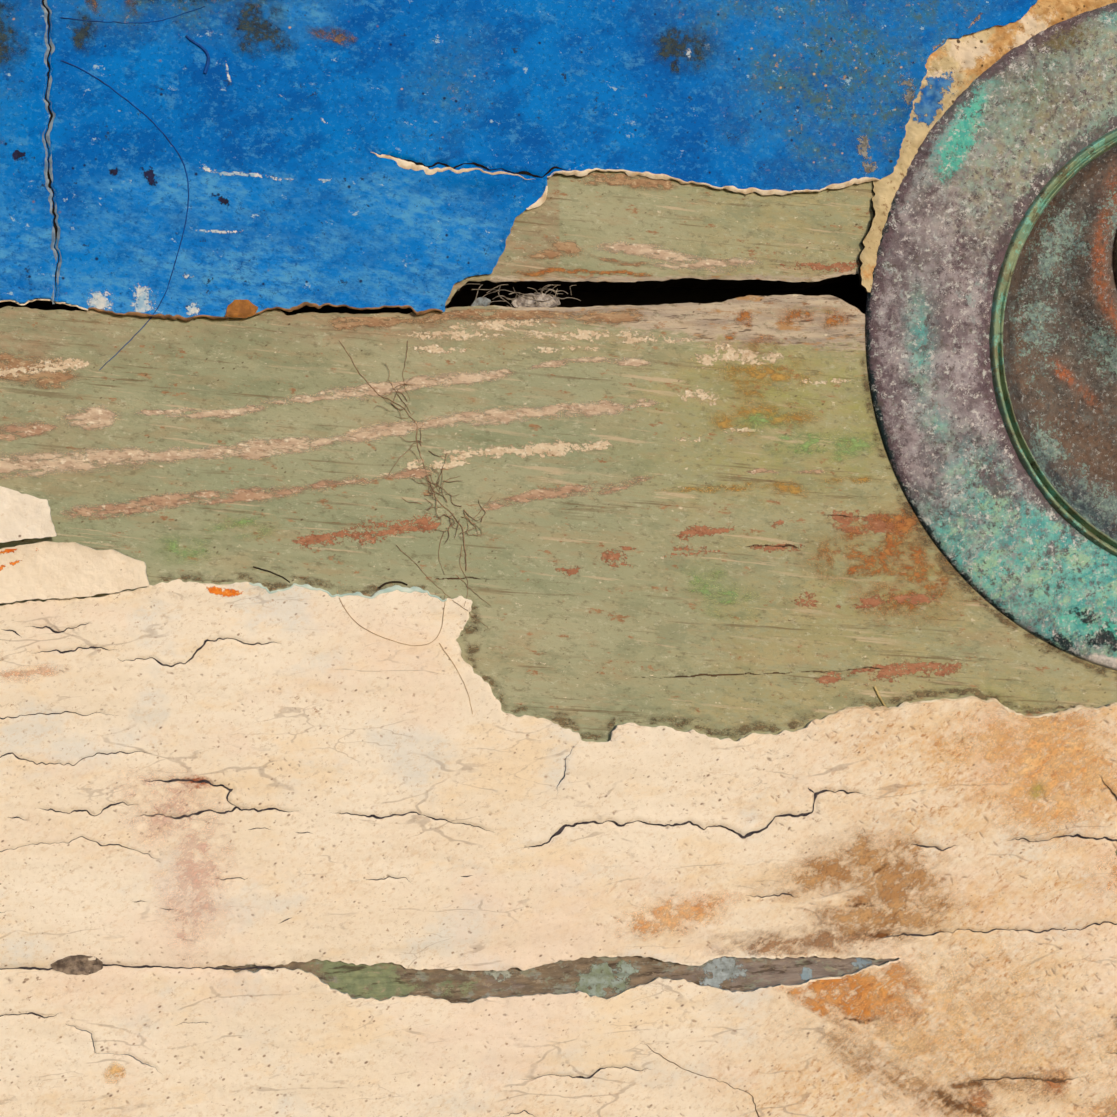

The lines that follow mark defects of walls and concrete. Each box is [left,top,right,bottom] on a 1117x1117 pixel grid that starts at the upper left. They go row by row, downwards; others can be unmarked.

crack [42,0,59,297]
peeling [0,0,880,454]
peeling [0,399,656,604]
peeling [828,484,1106,676]
crack [2,623,277,667]
peeling [675,661,1117,719]
crack [0,751,313,858]
crack [524,788,862,848]
crack [877,921,1117,940]
spalling [51,955,103,975]
crack [93,963,280,971]
spalling [216,956,897,1003]